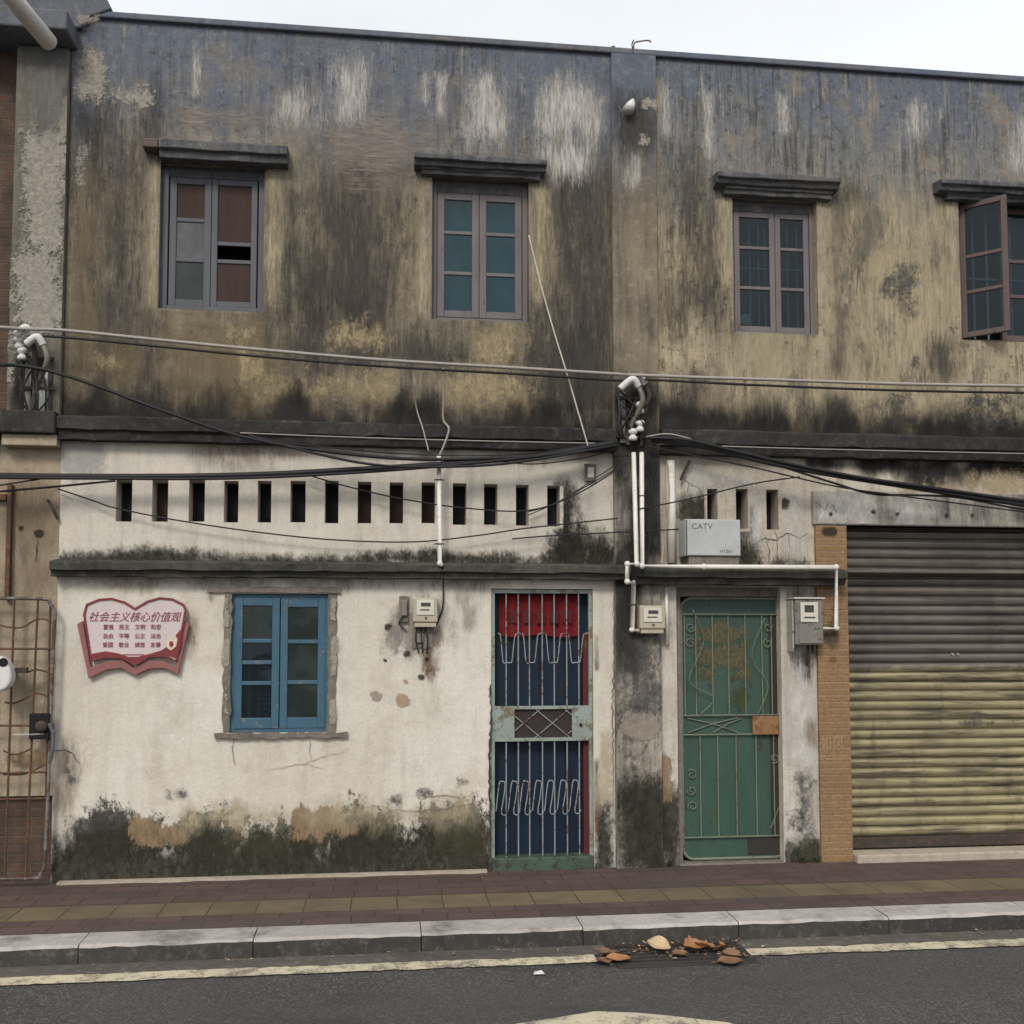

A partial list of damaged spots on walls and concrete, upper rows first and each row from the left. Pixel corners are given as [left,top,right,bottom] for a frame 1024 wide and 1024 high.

water stain [331,62,371,123]
water stain [461,72,506,147]
water stain [615,87,671,189]
flaking render [7,45,156,389]
water stain [532,72,602,300]
water stain [98,167,158,370]
water stain [511,338,612,413]
water stain [869,341,952,427]
crack [753,532,808,563]
spalling [127,813,190,850]
spalling [290,802,359,843]
water stain [792,772,812,832]